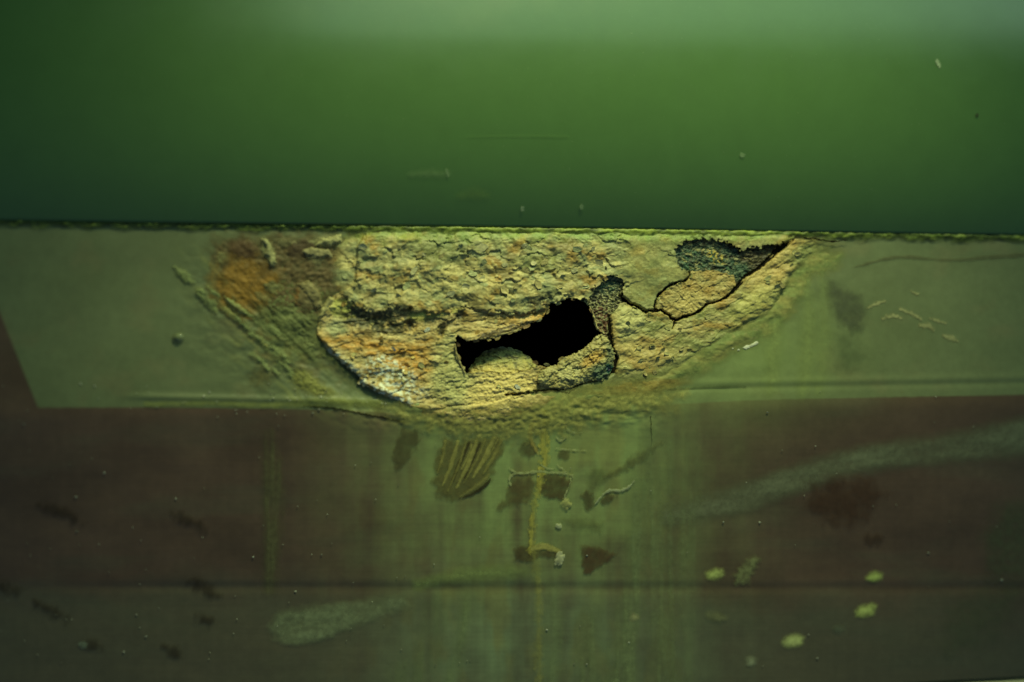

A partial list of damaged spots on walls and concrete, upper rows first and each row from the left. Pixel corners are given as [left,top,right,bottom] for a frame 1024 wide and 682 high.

peeling [334,228,826,383]
crack [608,238,848,374]